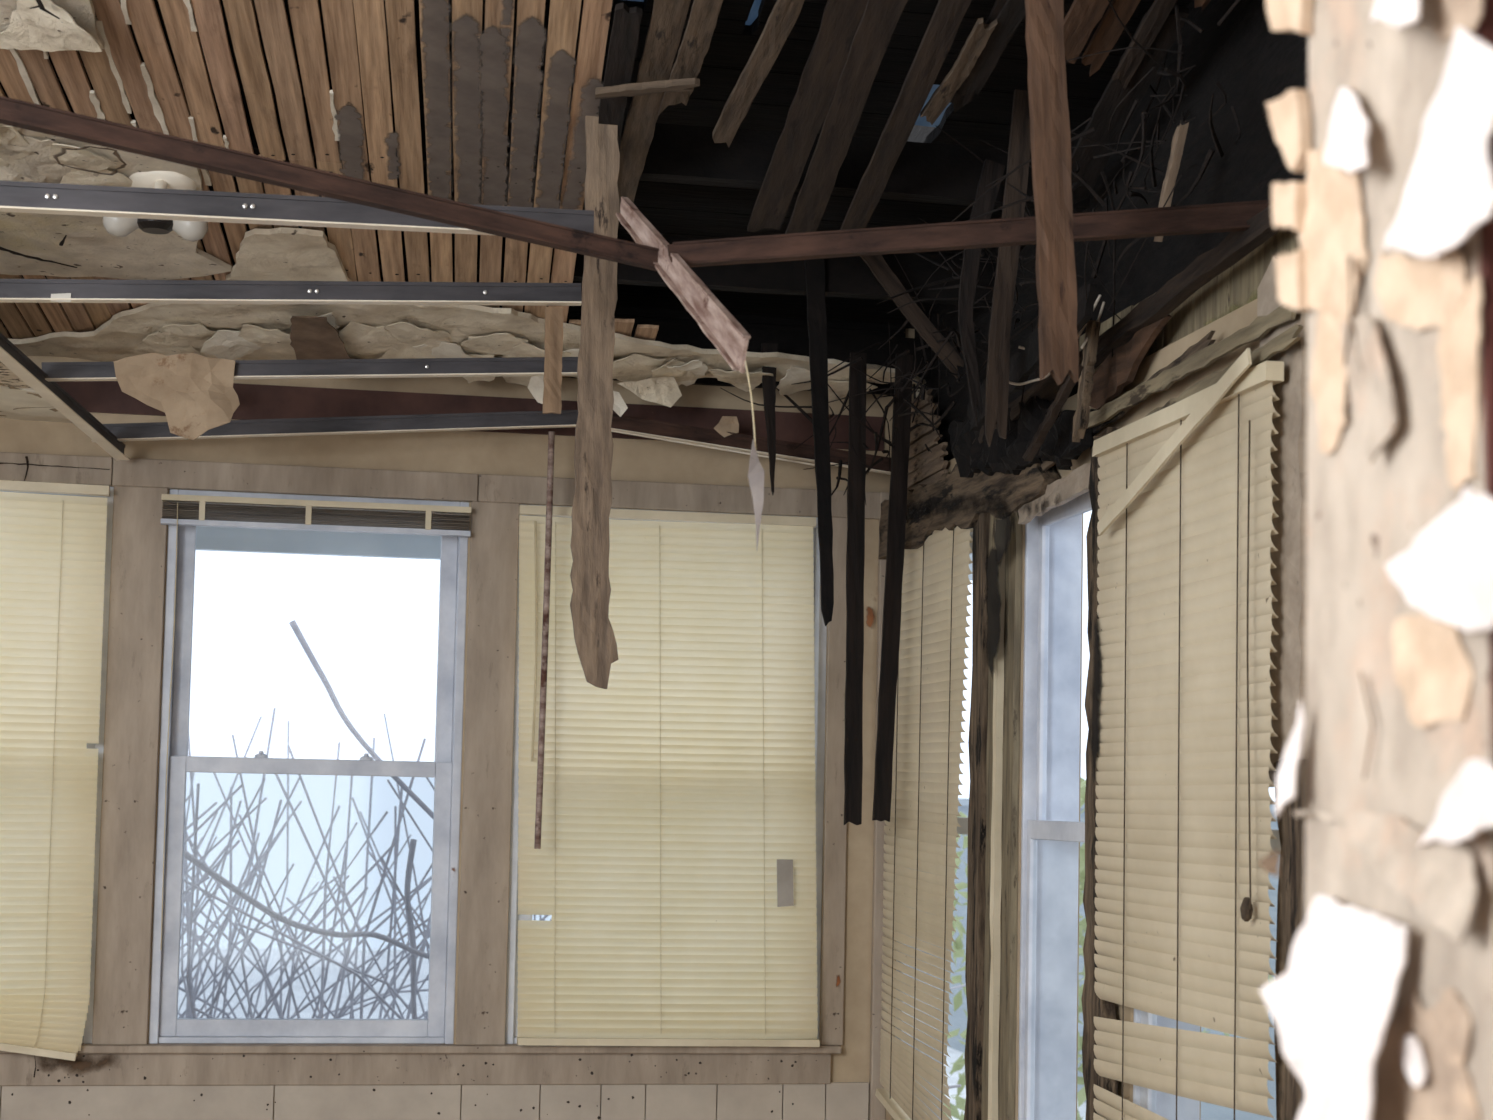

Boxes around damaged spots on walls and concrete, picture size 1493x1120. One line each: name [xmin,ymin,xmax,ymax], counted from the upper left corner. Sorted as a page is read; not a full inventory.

flaking render [0,0,105,52]
damp [421,0,603,209]
flaking render [0,124,203,191]
crack [0,235,77,268]
flaking render [0,212,351,281]
flaking render [8,303,581,362]
flaking render [463,376,544,404]
flaking render [613,333,926,417]
peeling [1265,0,1493,728]
peeling [714,416,739,437]
peeling [1257,699,1493,1120]